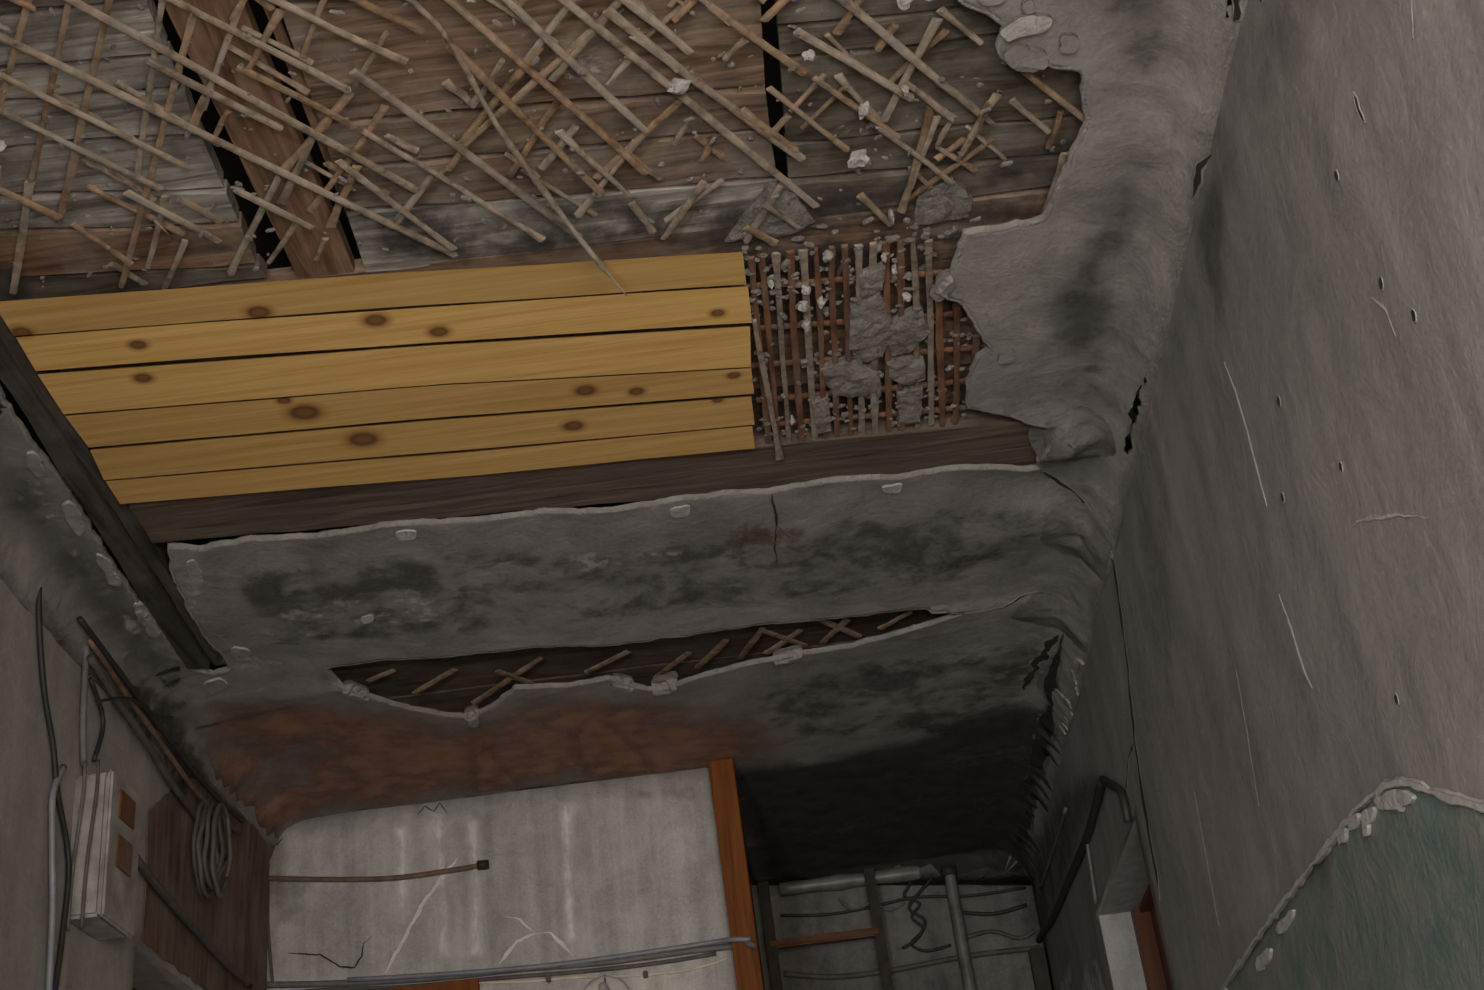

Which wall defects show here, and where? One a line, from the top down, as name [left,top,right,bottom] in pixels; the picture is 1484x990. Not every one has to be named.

crack [1231,0,1244,22]
spalling [0,0,1090,694]
crack [0,397,9,422]
spalling [325,608,966,728]